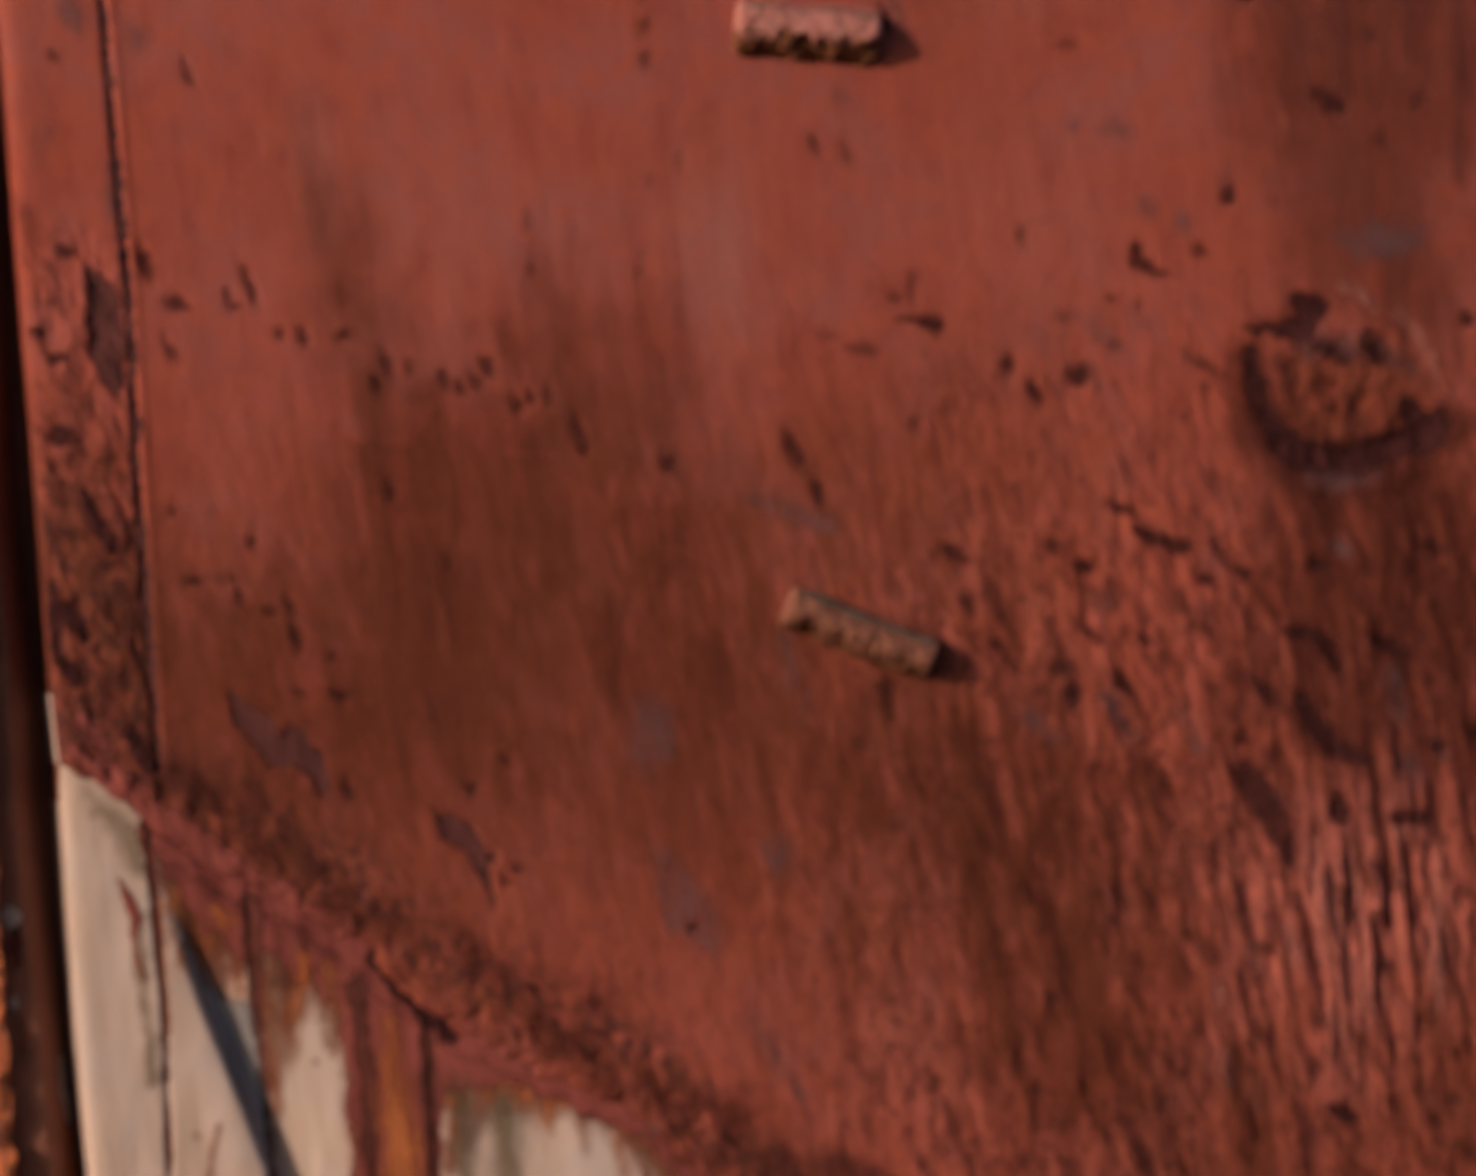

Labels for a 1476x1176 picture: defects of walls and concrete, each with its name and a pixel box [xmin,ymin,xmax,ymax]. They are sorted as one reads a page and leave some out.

corrosion [1236,291,1470,494]
corrosion [61,710,699,1176]
peeling [433,808,495,909]